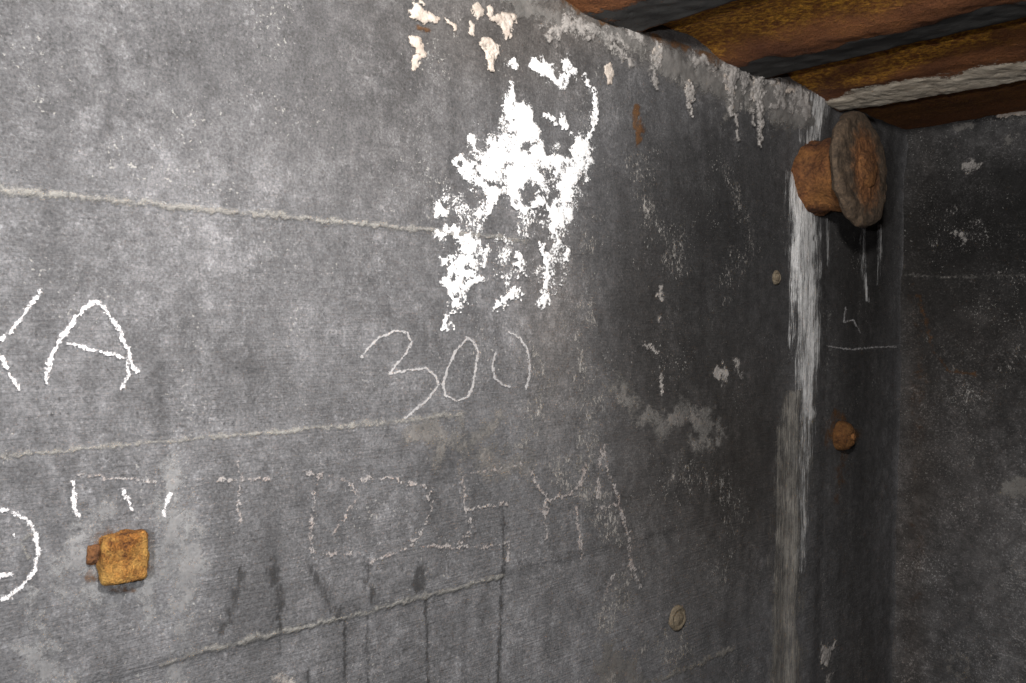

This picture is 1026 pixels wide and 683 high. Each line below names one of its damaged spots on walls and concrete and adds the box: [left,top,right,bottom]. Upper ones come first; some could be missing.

damp [403,53,727,548]
efflorescence [768,173,830,683]